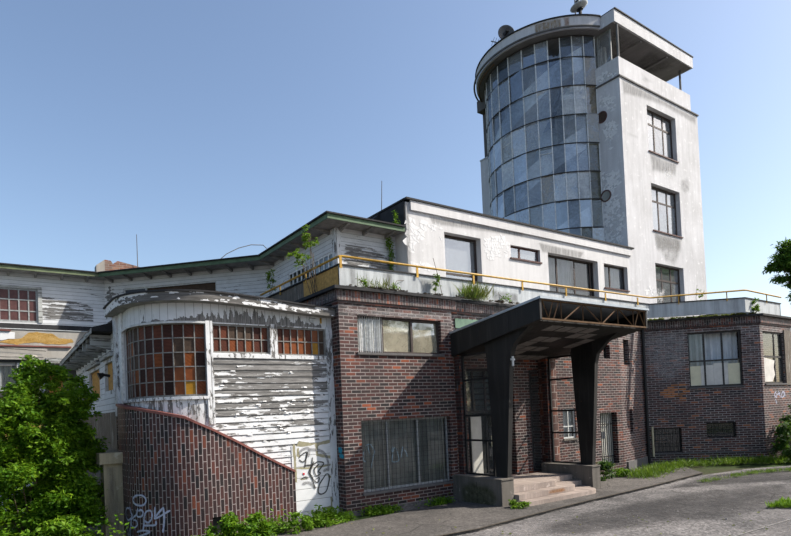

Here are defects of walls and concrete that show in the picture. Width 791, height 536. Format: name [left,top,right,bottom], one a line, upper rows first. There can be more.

peeling [601,170,625,244]
peeling [403,216,443,272]
peeling [42,297,93,322]
peeling [104,285,180,322]
peeling [141,291,333,328]
flaking render [0,331,73,345]
peeling [127,358,331,483]